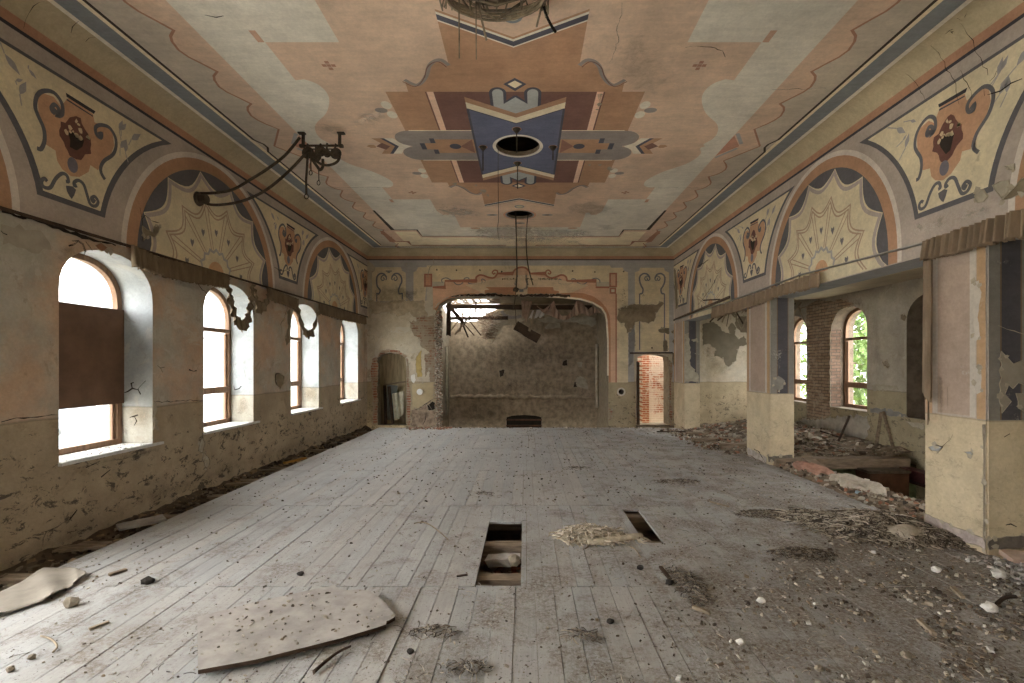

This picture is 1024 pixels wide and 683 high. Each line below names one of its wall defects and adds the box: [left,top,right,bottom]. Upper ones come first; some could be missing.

crack [930,15,1021,103]
crack [124,382,202,425]
flaking render [368,299,436,384]
flaking render [617,268,747,427]
flaking render [997,351,1024,413]